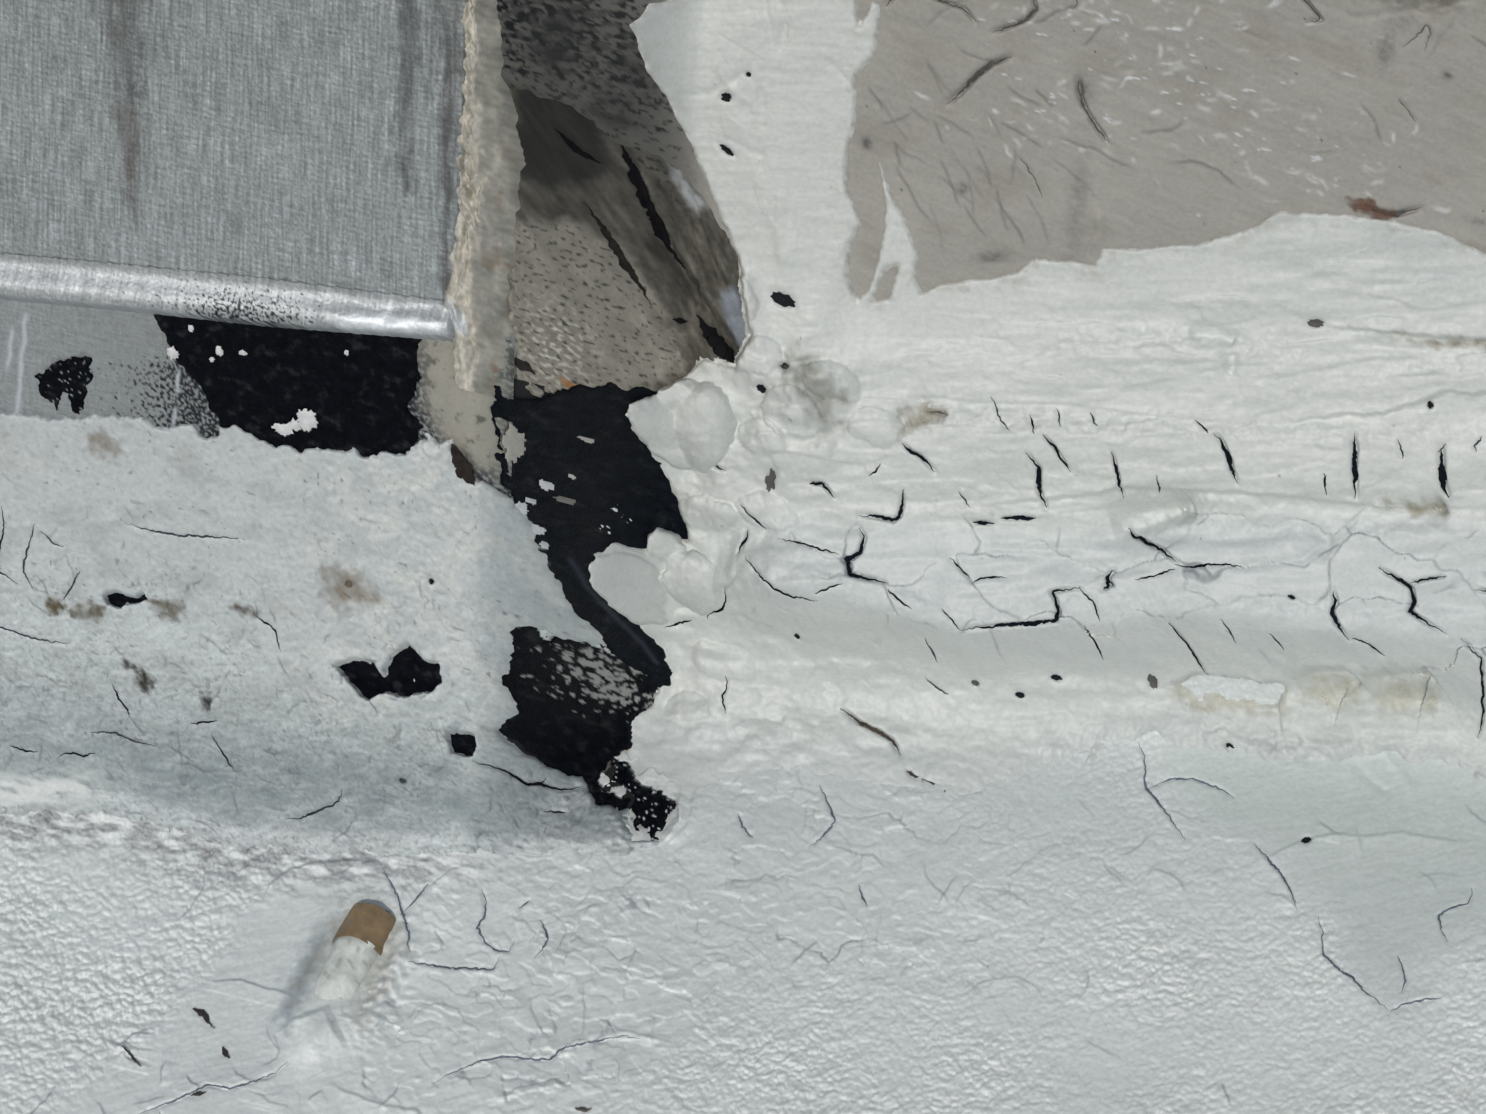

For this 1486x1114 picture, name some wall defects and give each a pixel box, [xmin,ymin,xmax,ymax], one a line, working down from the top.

spalling [1307,319,1325,328]
peeling [34,356,93,415]
peeling [154,314,423,457]
crack [1323,434,1359,498]
crack [1438,436,1482,498]
crack [738,396,1241,695]
peeling [338,645,442,699]
peeling [490,382,688,841]
crack [1330,591,1385,656]
crack [1379,567,1485,738]
peeling [450,733,476,756]
crack [383,869,549,971]